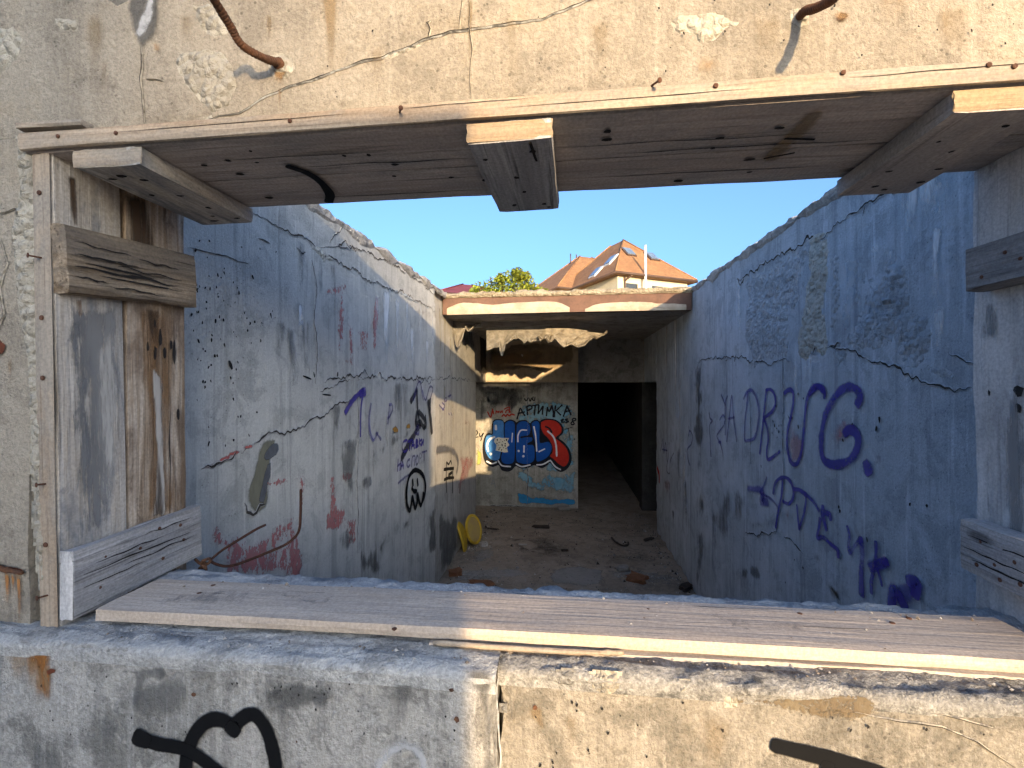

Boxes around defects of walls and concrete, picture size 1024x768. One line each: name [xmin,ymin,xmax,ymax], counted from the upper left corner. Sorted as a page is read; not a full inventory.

spalling [176,0,295,120]
crack [211,0,590,119]
spalling [671,0,739,47]
crack [189,247,248,264]
crack [736,194,894,287]
spalling [745,232,955,380]
crack [242,213,470,550]
crack [697,340,973,499]
rust [0,565,24,608]
rust [31,655,55,693]